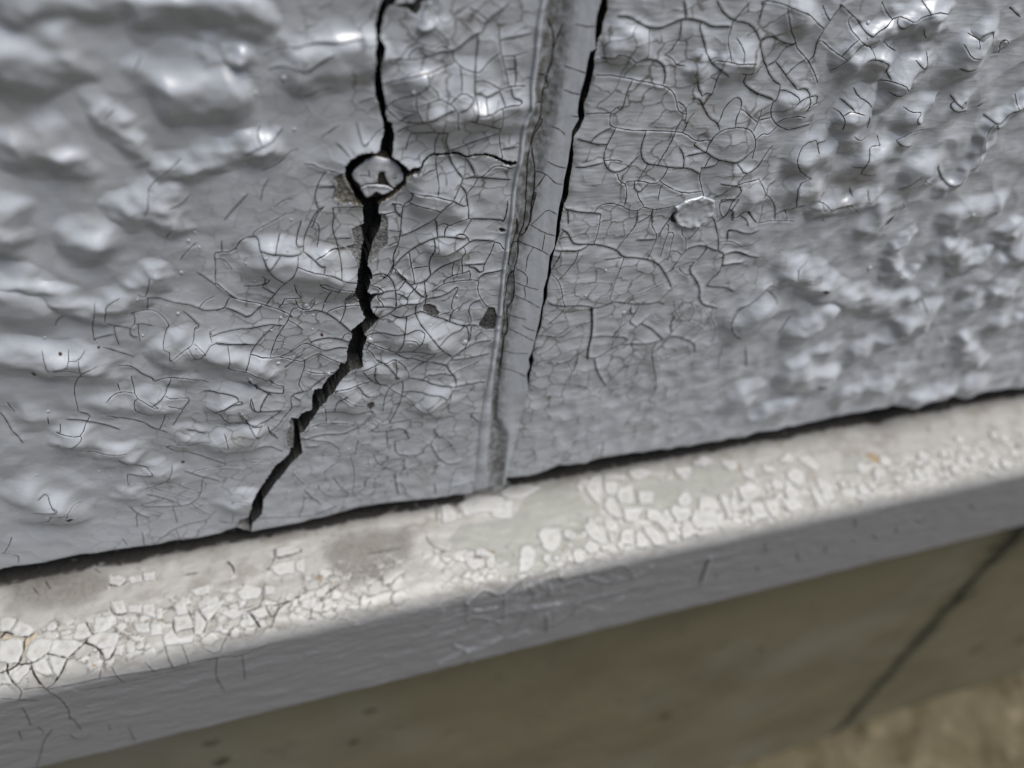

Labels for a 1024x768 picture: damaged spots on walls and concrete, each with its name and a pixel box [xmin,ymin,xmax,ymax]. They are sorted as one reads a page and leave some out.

crack [42,0,1023,552]
crack [34,495,82,525]
peeling [0,545,326,685]
crack [267,549,302,570]
peeling [440,431,1019,575]